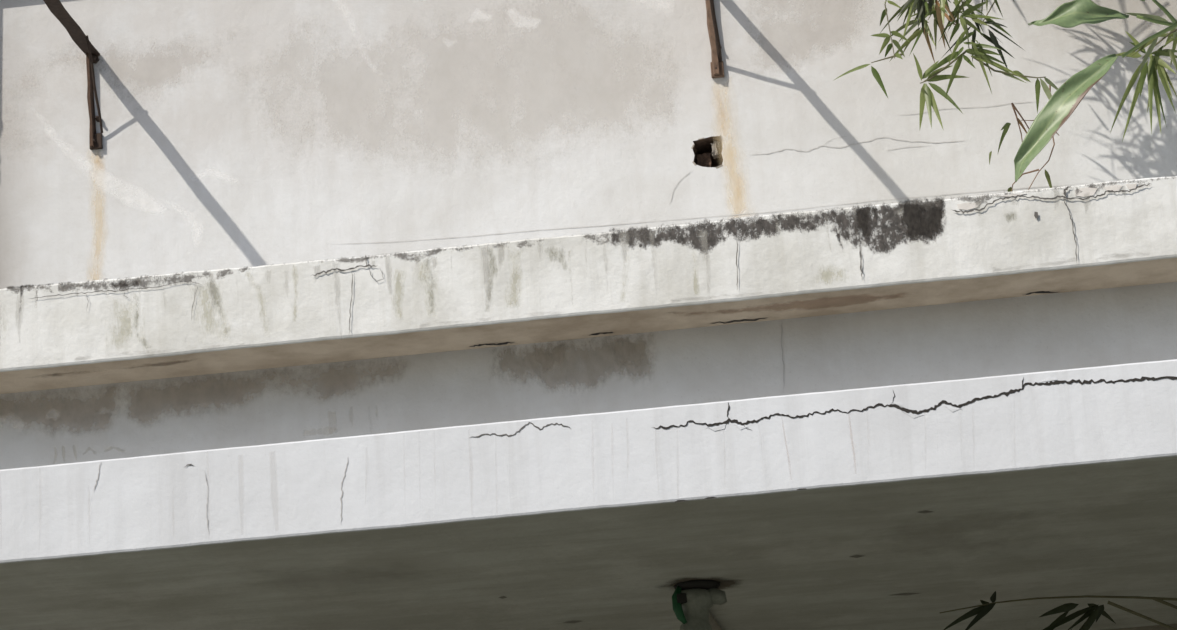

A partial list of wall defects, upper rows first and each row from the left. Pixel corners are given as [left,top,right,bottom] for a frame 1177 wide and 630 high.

hole [691,135,723,169]
rust [720,93,744,216]
water stain [1076,177,1175,194]
water stain [584,192,1008,271]
water stain [7,267,249,312]
water stain [338,245,469,317]
water stain [0,363,404,433]
crack [470,422,571,438]
water stain [498,339,652,389]
crack [651,318,1177,431]